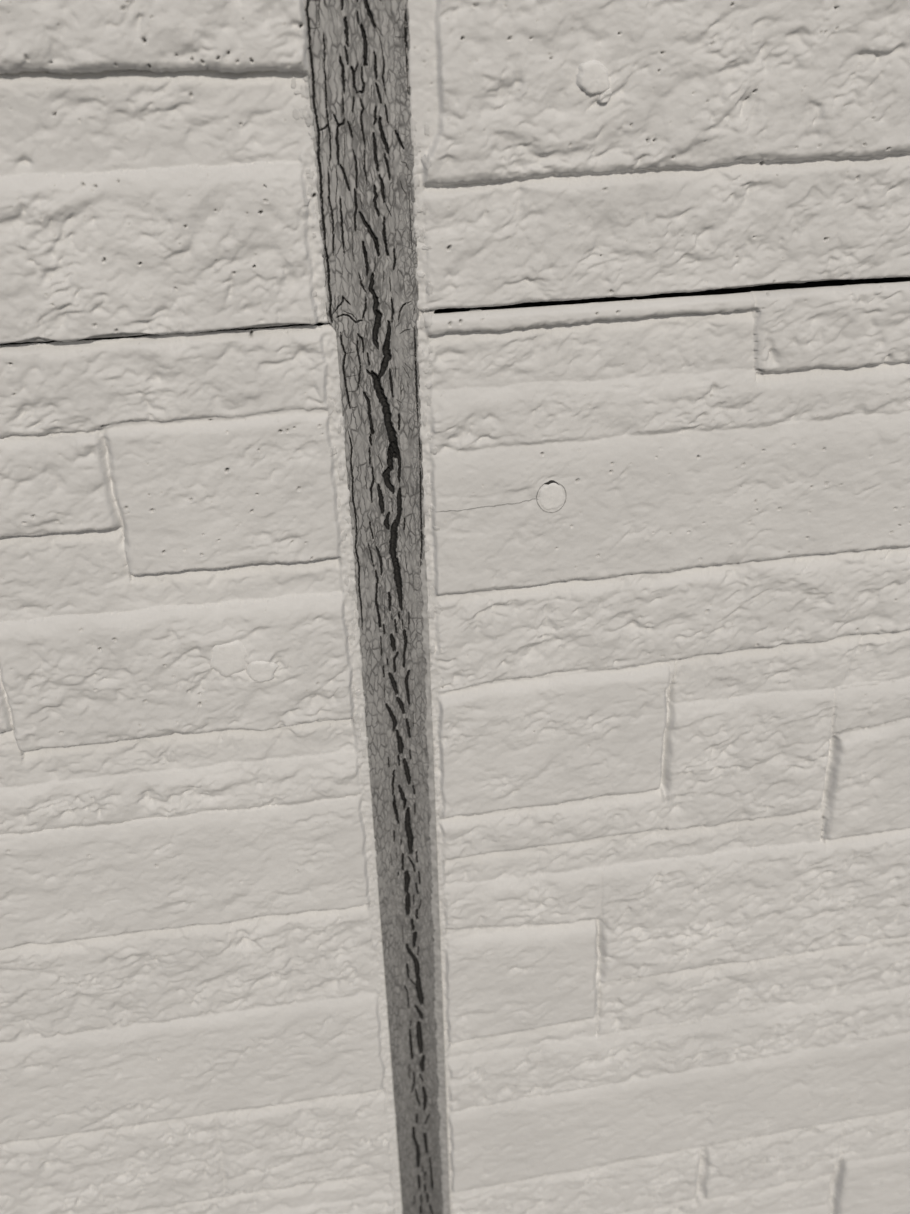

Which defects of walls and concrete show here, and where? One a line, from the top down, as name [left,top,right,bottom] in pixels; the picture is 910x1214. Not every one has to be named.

crack [306,0,539,1214]